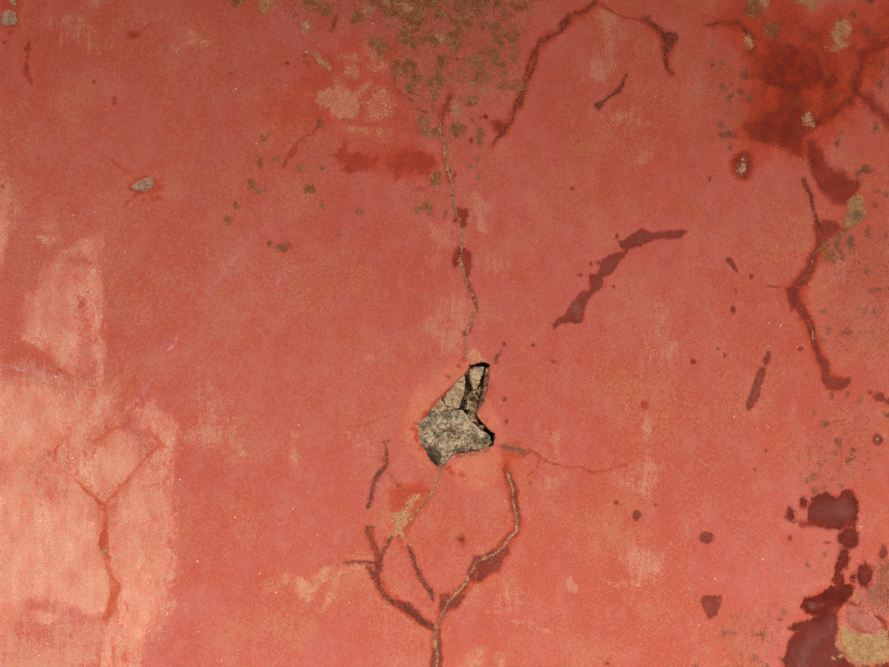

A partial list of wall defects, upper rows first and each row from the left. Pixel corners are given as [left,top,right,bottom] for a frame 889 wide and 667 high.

spalling [1,0,17,44]
peeling [309,44,397,137]
crack [492,1,679,147]
damp [704,42,754,151]
damp [802,112,815,130]
damp [824,11,856,53]
spalling [131,177,154,193]
crack [395,86,478,361]
crack [785,179,851,390]
flaking render [405,348,503,489]
crack [344,440,627,667]